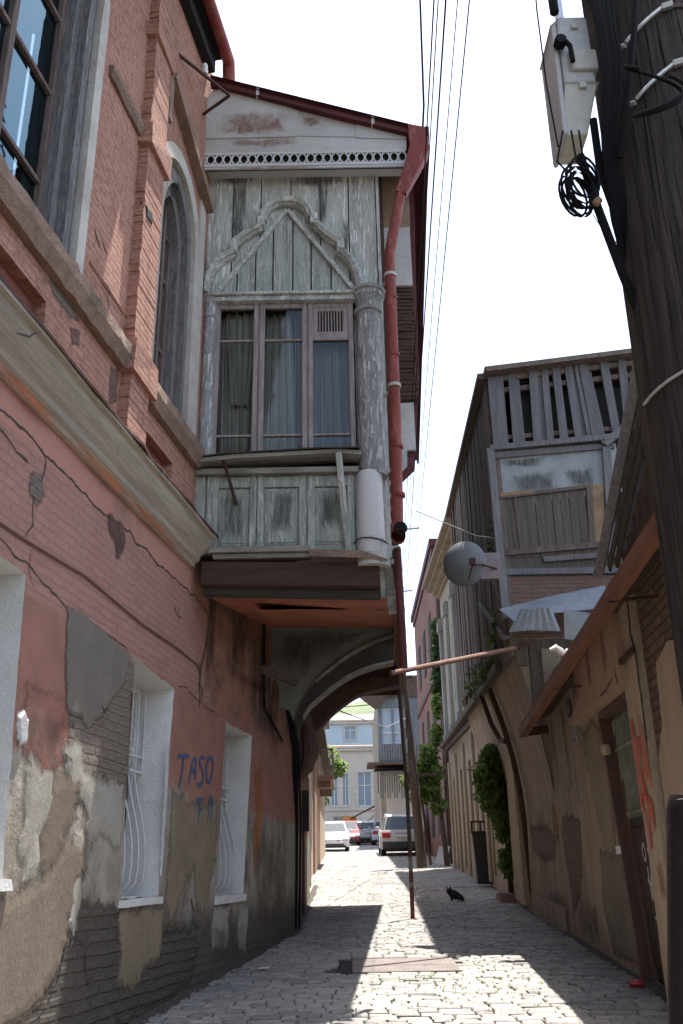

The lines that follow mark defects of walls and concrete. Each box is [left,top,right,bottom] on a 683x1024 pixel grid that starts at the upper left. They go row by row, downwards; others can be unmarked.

spalling [28,471,44,506]
crack [0,409,208,618]
spalling [108,514,125,559]
crack [178,666,219,716]
flaking render [0,663,135,1024]